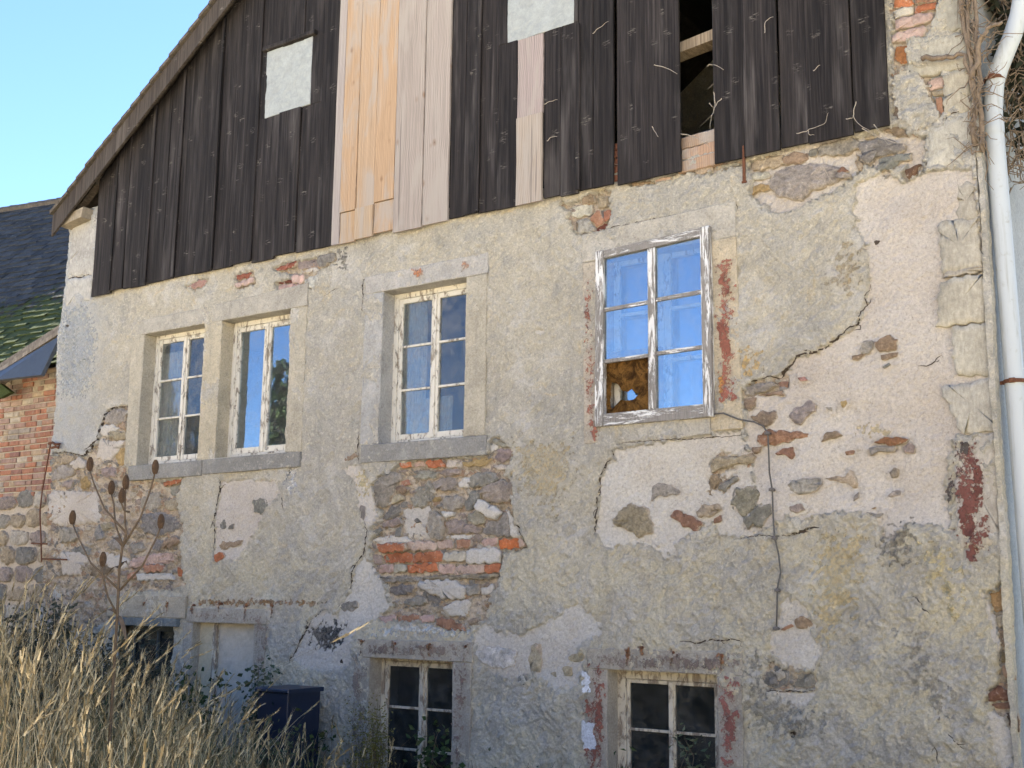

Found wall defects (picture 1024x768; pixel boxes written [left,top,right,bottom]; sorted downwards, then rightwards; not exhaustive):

flaking render [187,279,208,291]
flaking render [234,272,256,289]
flaking render [275,253,337,290]
peeling [595,0,991,562]
crack [751,285,871,382]
flaking render [41,406,186,631]
crack [211,480,224,548]
crack [350,521,367,588]
leakage [304,619,348,652]
flaking render [291,438,740,768]